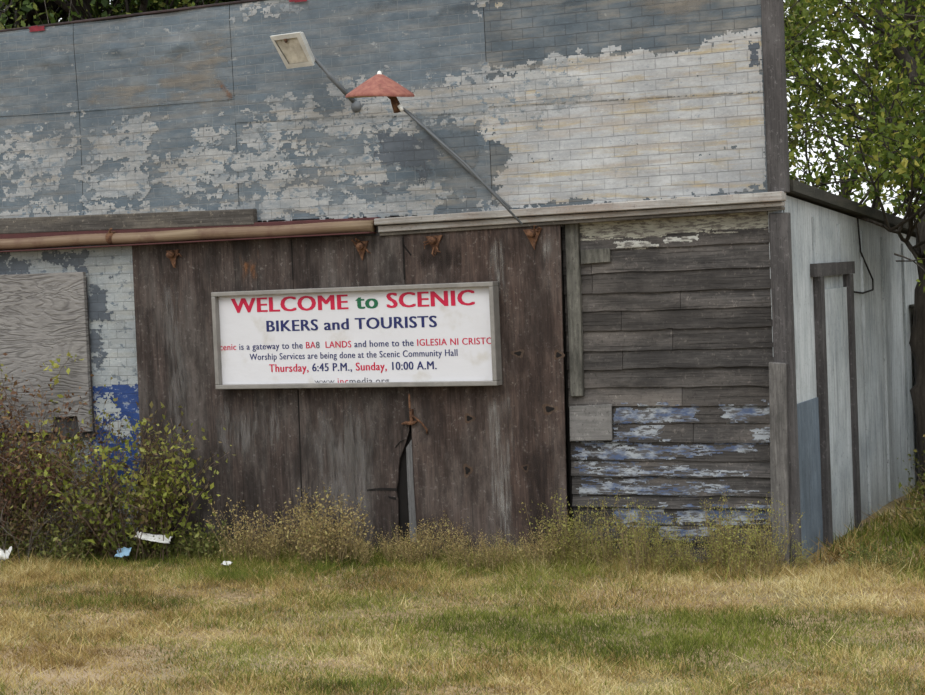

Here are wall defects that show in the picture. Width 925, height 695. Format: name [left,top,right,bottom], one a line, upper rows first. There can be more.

peeling [0,27,769,250]
peeling [0,252,32,275]
peeling [41,248,89,273]
peeling [88,284,114,369]
peeling [93,392,132,440]
peeling [563,328,771,542]
crack [367,429,417,542]